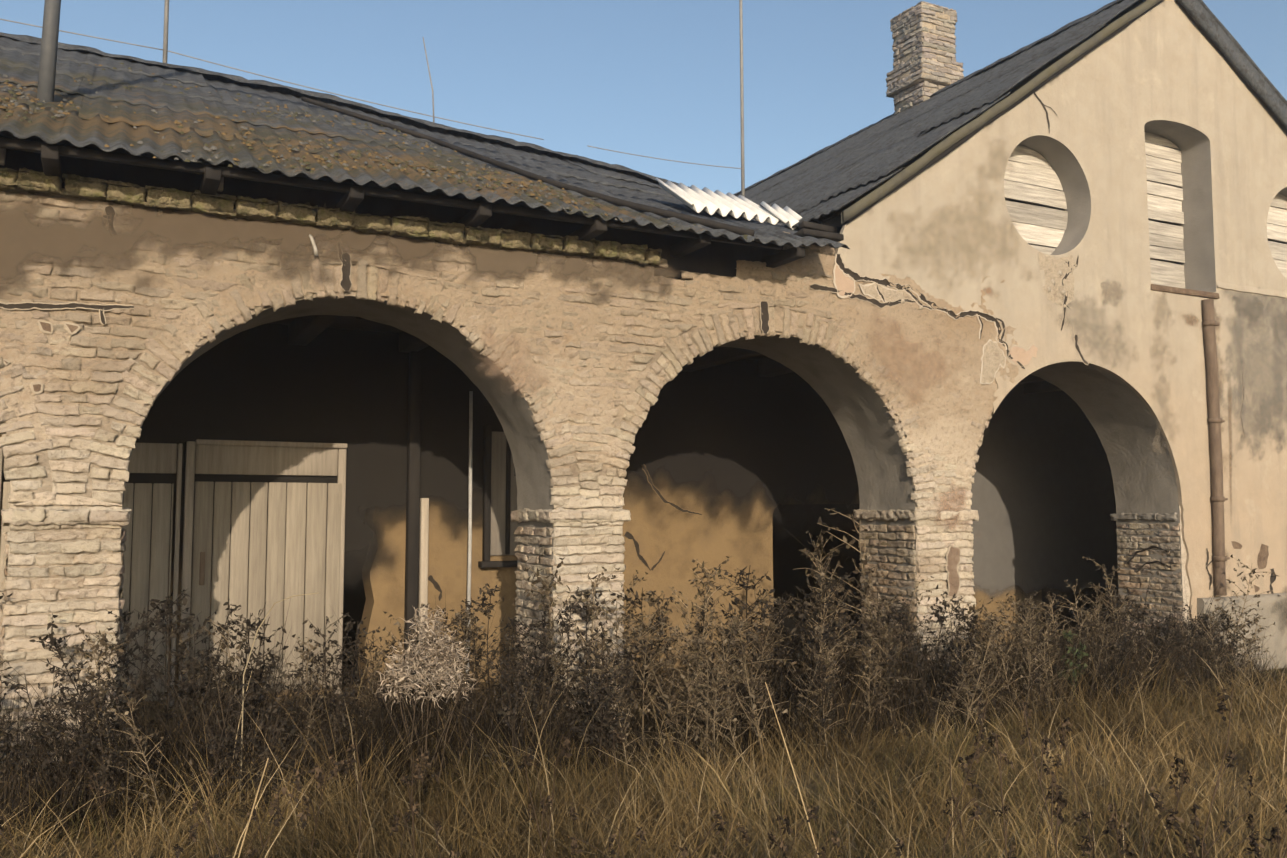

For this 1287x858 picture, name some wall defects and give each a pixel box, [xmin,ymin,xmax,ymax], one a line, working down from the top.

crack [1033,92,1058,133]
spalling [833,264,923,310]
crack [810,254,1025,370]
spalling [1037,251,1078,308]
leakage [1225,290,1287,448]
crack [624,531,665,571]
crack [1127,545,1171,572]
crack [1205,548,1230,634]
spalling [1231,540,1269,594]